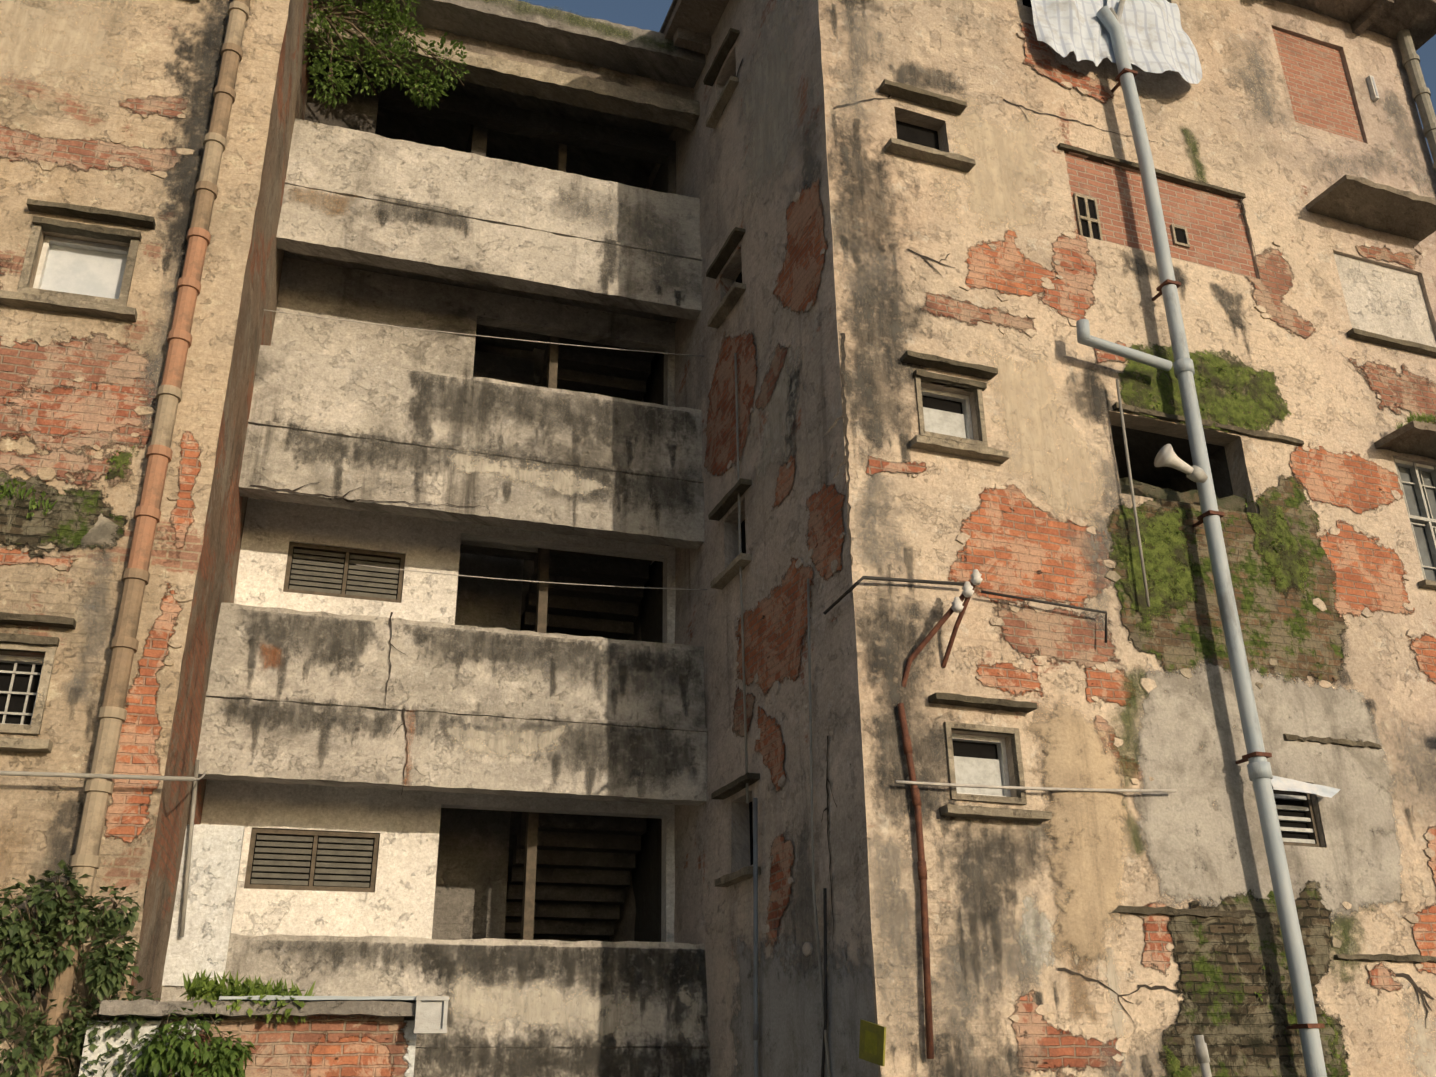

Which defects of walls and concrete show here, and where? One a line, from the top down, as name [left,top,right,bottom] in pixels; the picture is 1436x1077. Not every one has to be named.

water stain [163,0,233,309]
water stain [802,0,926,474]
spalling [921,230,1099,338]
spalling [0,331,157,572]
water stain [284,371,697,525]
water stain [859,473,956,831]
spalling [948,442,1436,785]
spalling [190,1015,410,1077]
water stain [272,940,708,1077]
crack [1058,968,1189,1023]
spalling [1137,889,1307,1077]
spalling [1295,880,1352,1077]